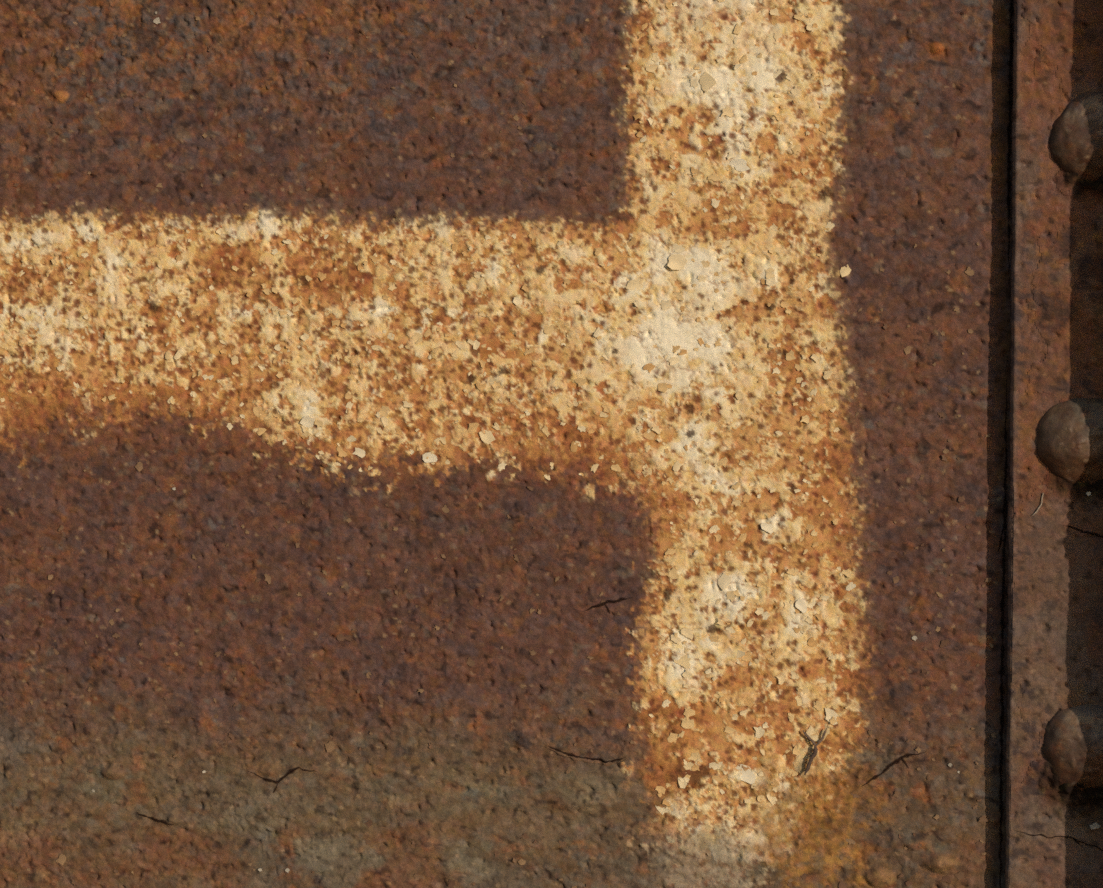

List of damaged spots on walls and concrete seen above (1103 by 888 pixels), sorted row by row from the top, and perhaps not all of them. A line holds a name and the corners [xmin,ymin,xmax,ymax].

rust [0,0,109,140]
rust [187,0,417,89]
rust [0,368,304,486]
peeling [410,437,450,464]
peeling [367,308,514,403]
rust [474,414,685,542]
peeling [542,239,731,491]
peeling [714,263,840,438]
rust [722,204,1006,888]
peeling [655,548,831,743]
rust [619,696,691,825]
peeling [655,722,801,815]